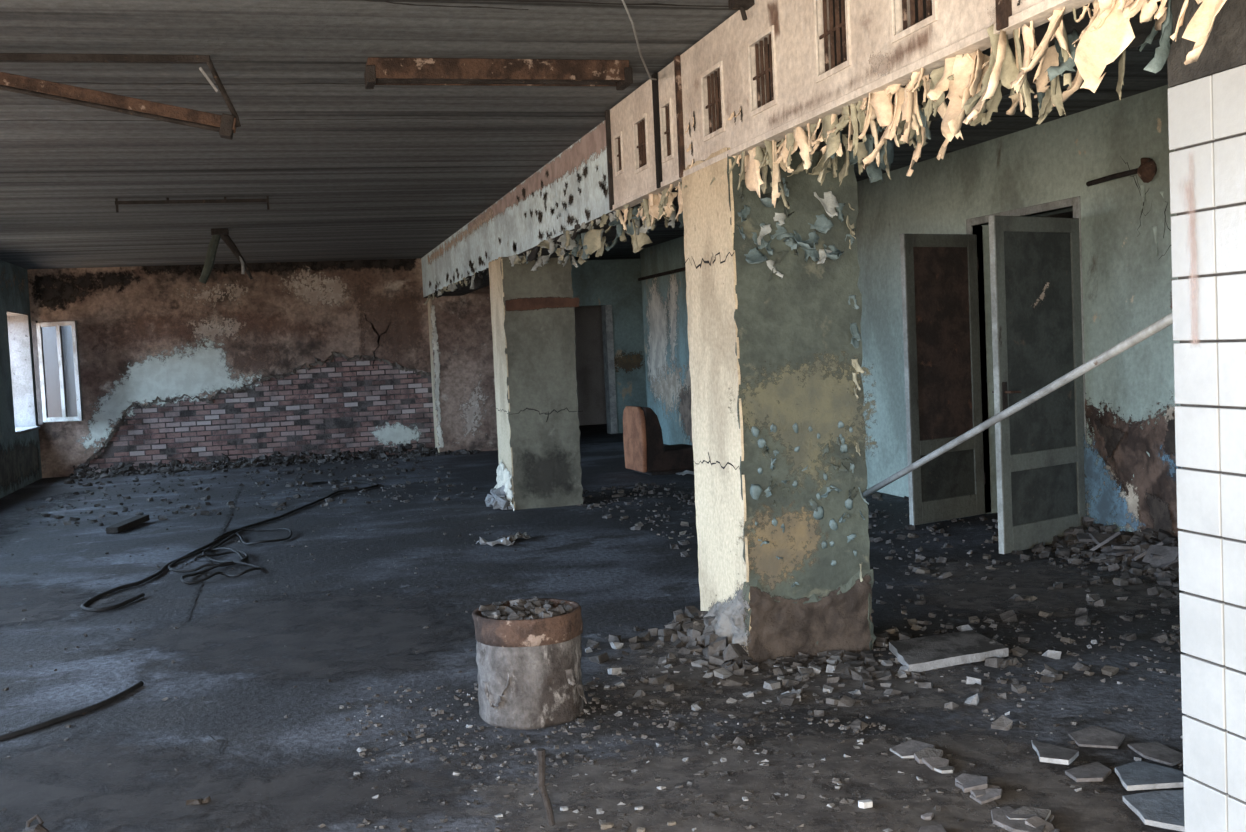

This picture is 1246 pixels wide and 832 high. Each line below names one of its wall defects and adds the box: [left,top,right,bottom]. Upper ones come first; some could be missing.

peeling [685,111,696,169]
peeling [710,0,1227,282]
crack [684,252,734,269]
peeling [701,295,878,662]
flaking render [1083,393,1184,542]